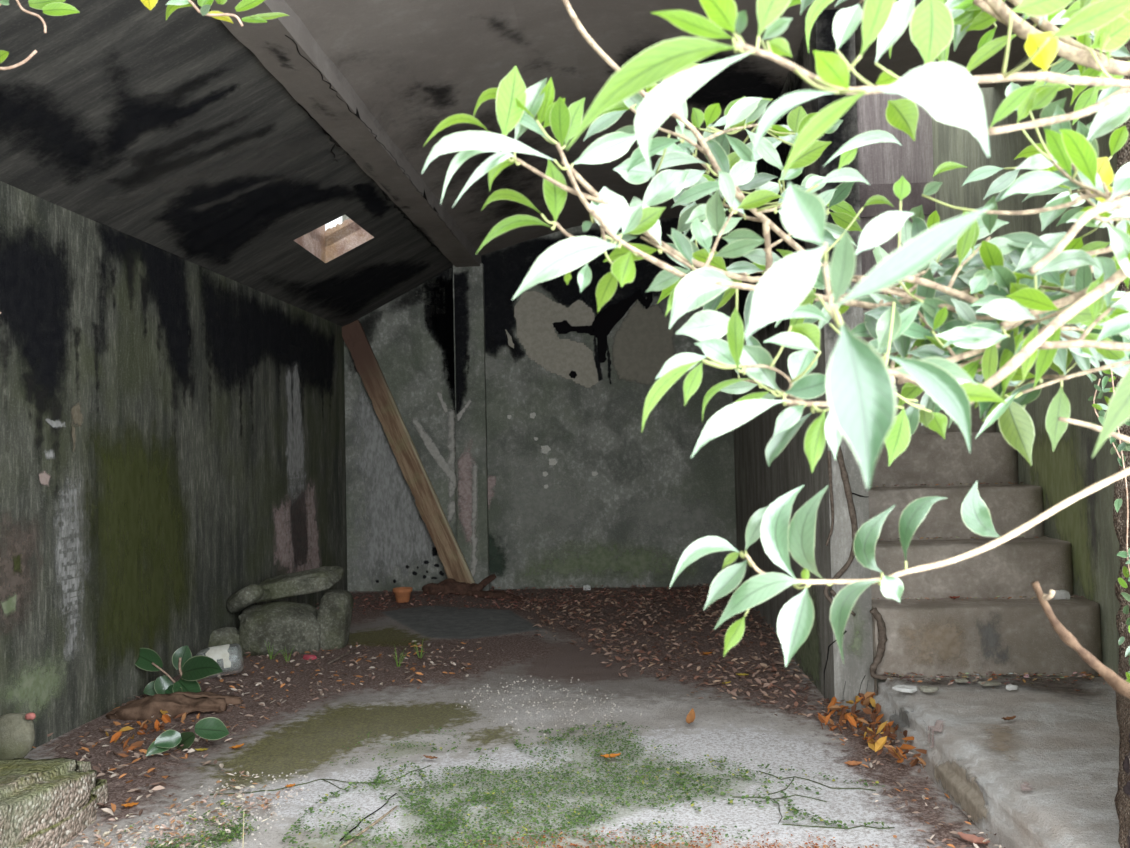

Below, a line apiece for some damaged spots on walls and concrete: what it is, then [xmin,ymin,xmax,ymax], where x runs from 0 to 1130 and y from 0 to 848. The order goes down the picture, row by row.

damp [113,121,272,188]
damp [158,71,235,127]
crack [285,35,455,254]
damp [111,255,161,349]
peeling [505,291,599,388]
peeling [612,301,675,384]
damp [27,377,62,457]
damp [278,362,308,567]
damp [0,513,39,631]
damp [56,487,89,656]